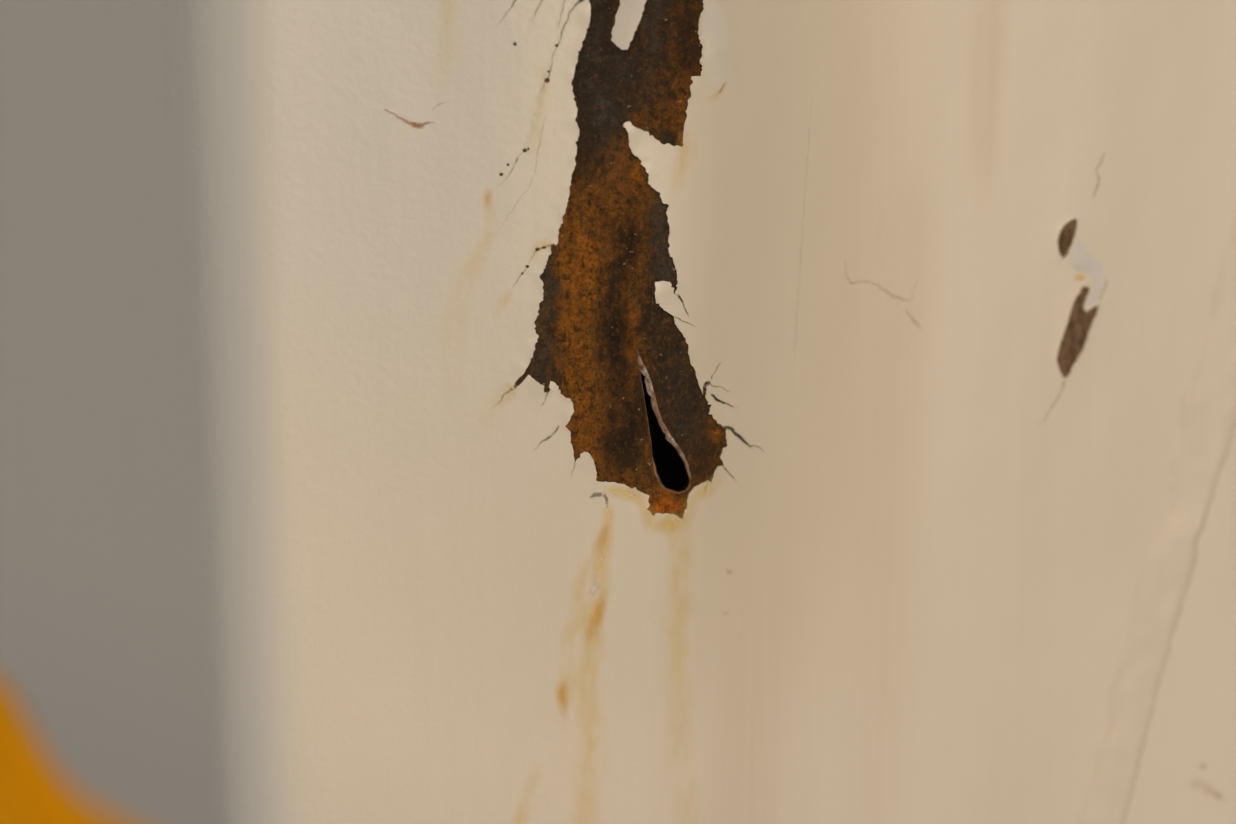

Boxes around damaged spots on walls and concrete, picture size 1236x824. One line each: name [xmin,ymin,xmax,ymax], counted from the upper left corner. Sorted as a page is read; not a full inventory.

corrosion [502,0,758,519]
peeling [1057,219,1107,386]